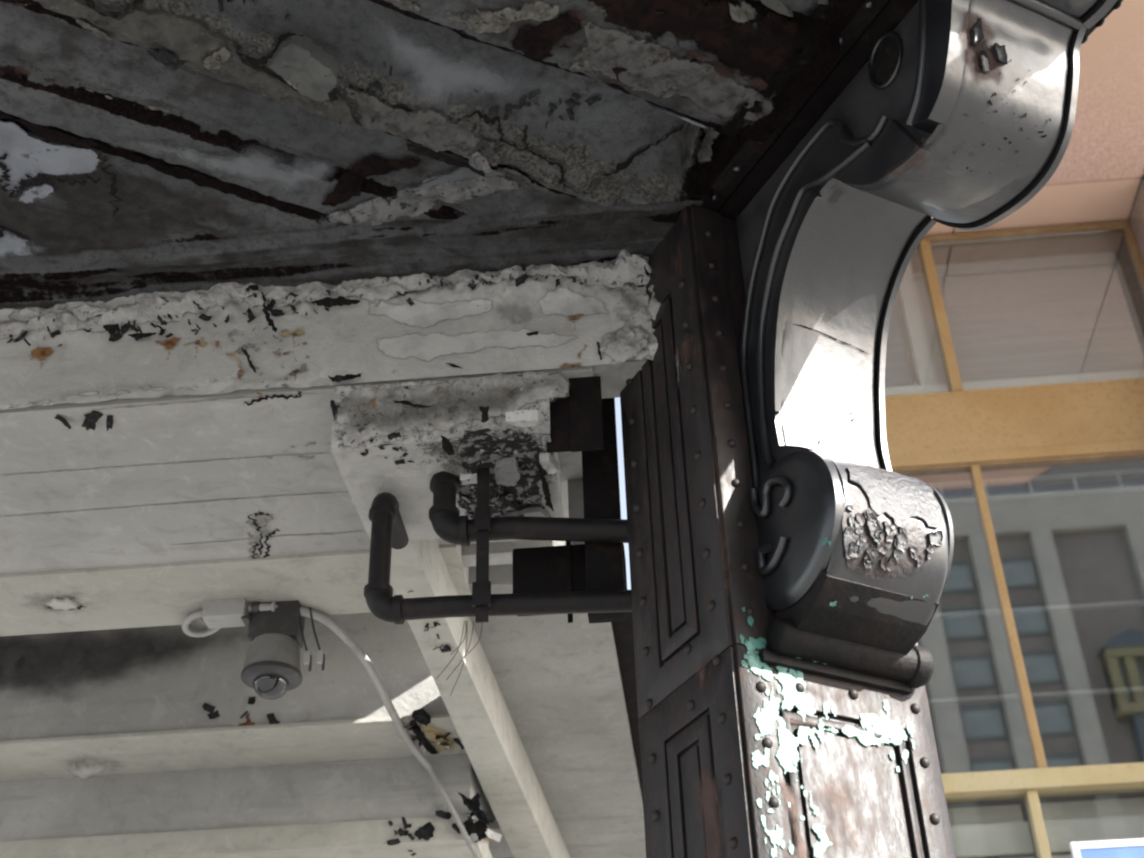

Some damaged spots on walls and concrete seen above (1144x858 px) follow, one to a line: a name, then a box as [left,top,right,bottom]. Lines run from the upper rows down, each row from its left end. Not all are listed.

peeling [752,0,793,29]
rust [961,12,1008,81]
flaking render [37,0,500,177]
flaking render [570,21,773,169]
peeling [0,121,99,203]
crack [462,110,684,193]
peeling [0,230,31,258]
spalling [0,254,662,519]
peeling [842,466,943,580]
peeling [741,637,907,789]
peeling [767,828,783,858]
peeling [811,800,832,858]